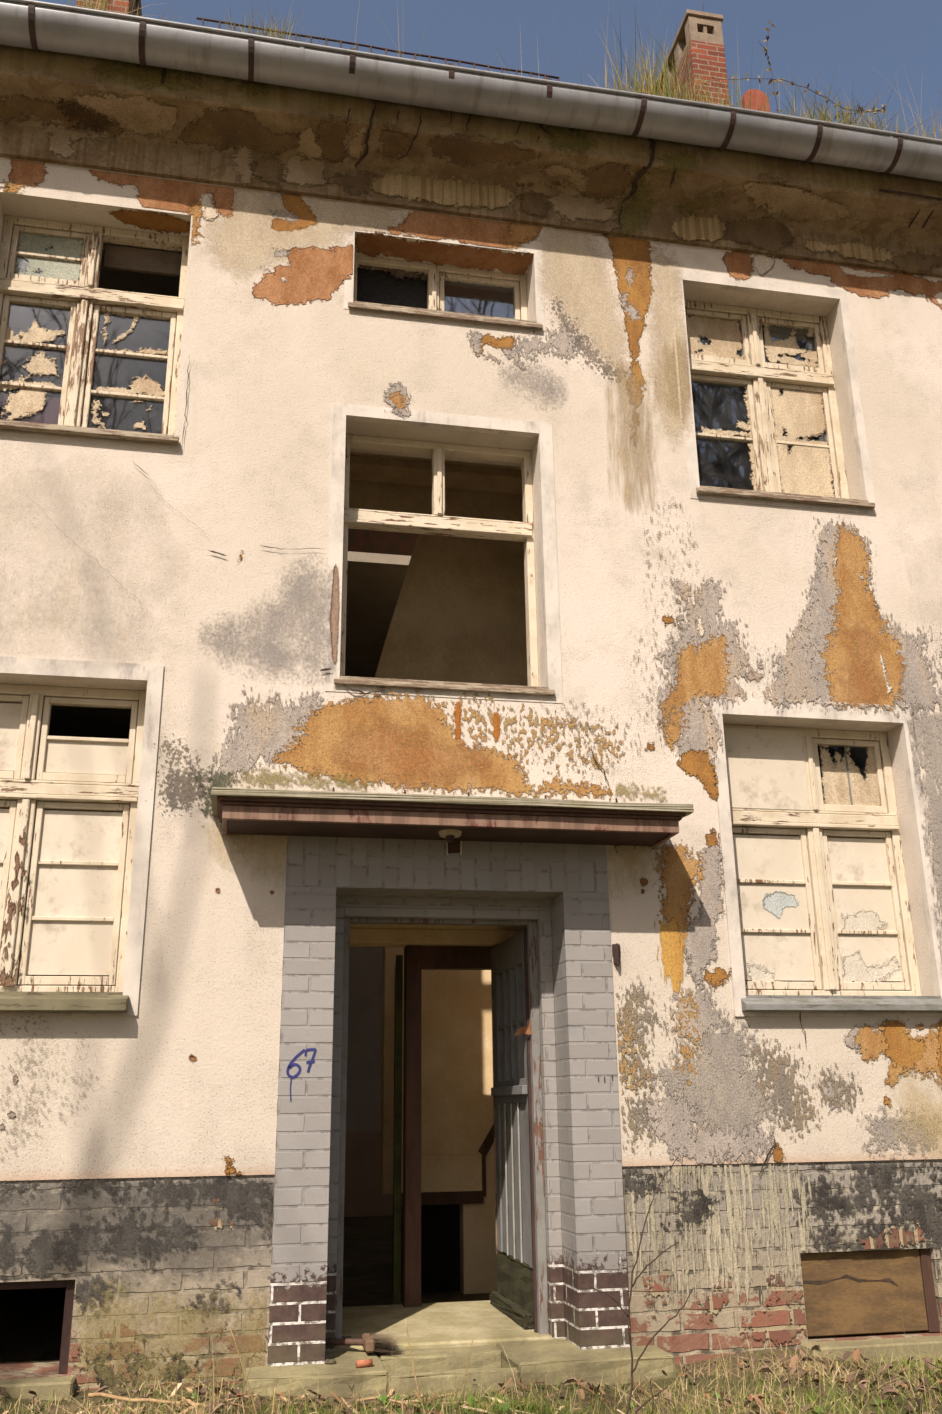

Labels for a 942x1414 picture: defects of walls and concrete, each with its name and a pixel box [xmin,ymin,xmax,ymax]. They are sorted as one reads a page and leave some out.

peeling [0,87,632,306]
damp [201,566,331,674]
spalling [211,498,942,960]
peeling [0,809,29,986]
peeling [615,828,942,1164]
damp [623,1164,813,1311]